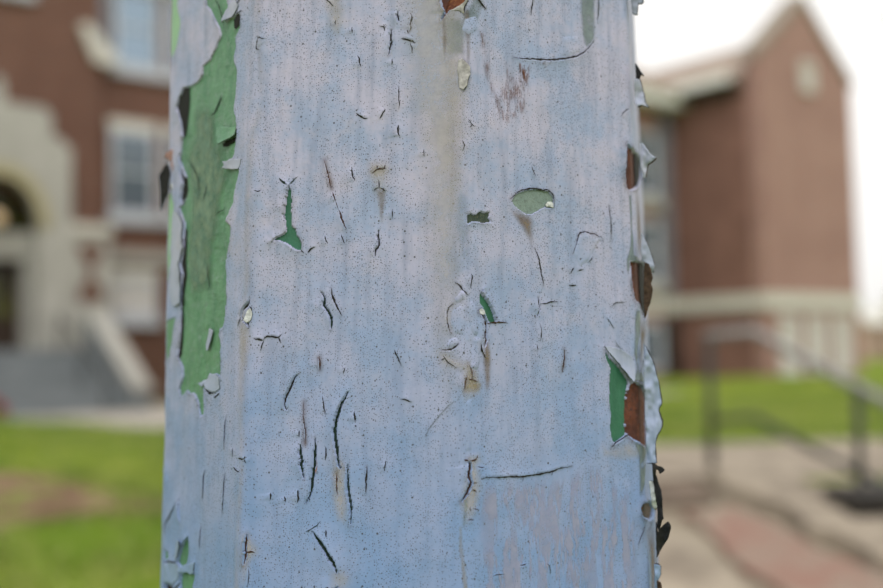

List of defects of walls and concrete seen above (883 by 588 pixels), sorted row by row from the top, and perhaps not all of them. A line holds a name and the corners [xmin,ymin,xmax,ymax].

corrosion [442,0,465,18]
crack [515,45,591,61]
peeling [159,0,241,415]
peeling [275,187,301,250]
crack [301,161,346,253]
peeling [479,294,495,322]
peeling [641,233,655,318]
crack [270,368,386,524]
crack [462,456,570,520]
corrosion [624,383,646,447]
peeling [605,343,671,588]
crack [306,523,338,588]